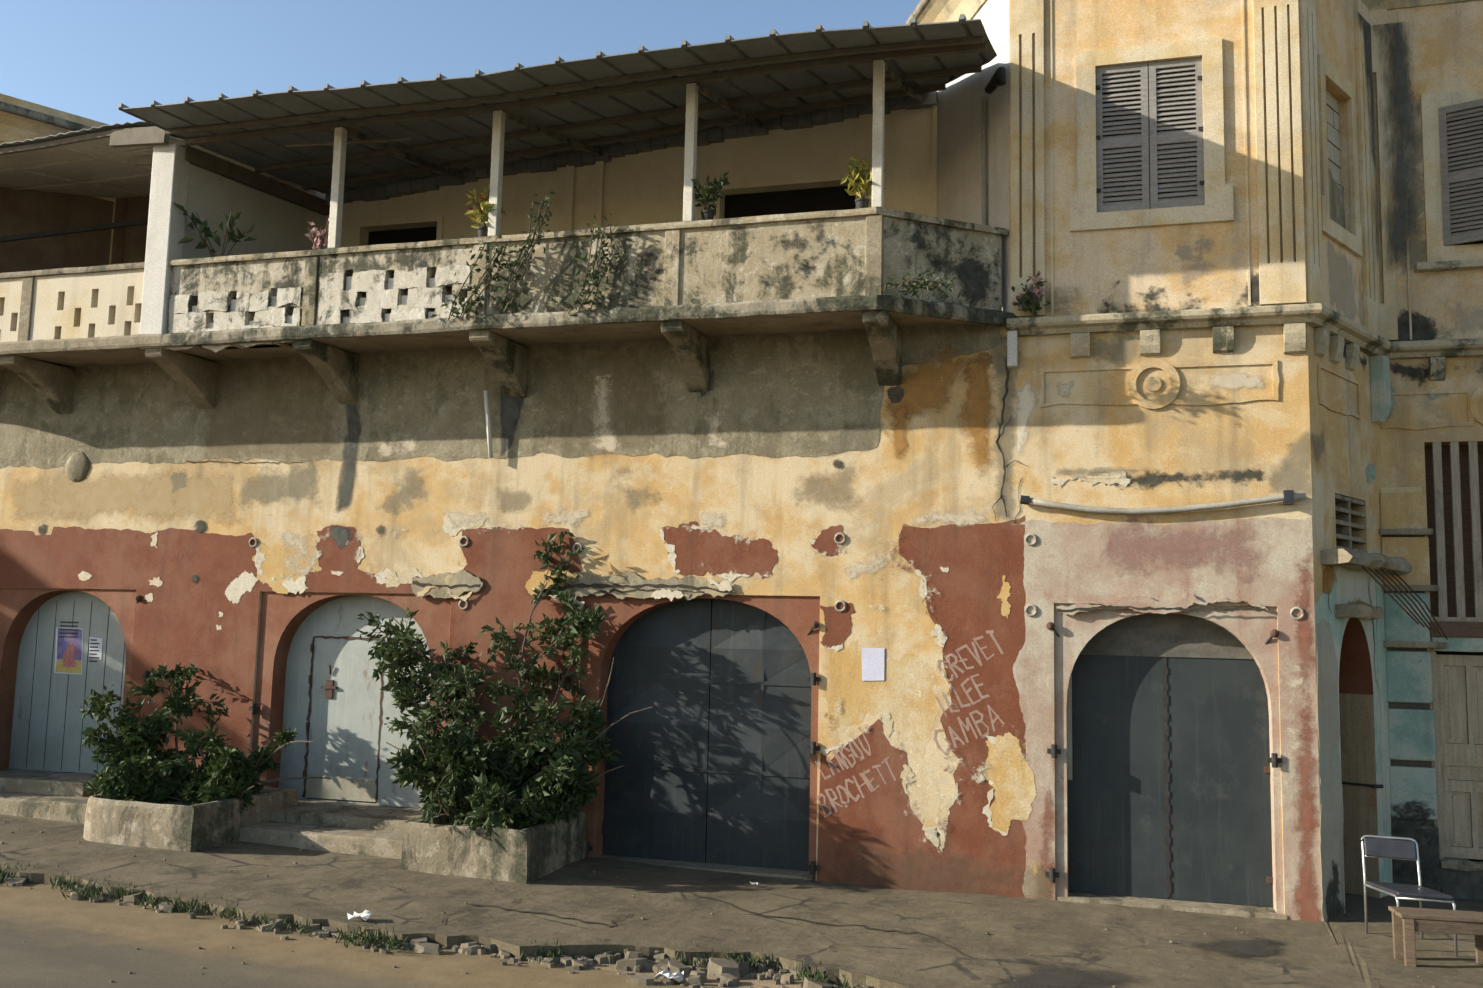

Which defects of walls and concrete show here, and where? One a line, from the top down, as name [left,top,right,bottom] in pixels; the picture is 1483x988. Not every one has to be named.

damp [1358,12,1424,269]
damp [400,253,447,271]
damp [631,244,663,303]
damp [763,224,840,288]
damp [910,222,998,306]
damp [1393,305,1483,341]
crack [992,357,1027,523]
peeling [144,577,163,602]
peeling [216,531,473,630]
peeling [707,570,768,591]
peeling [821,536,1037,852]
damp [1277,659,1303,797]